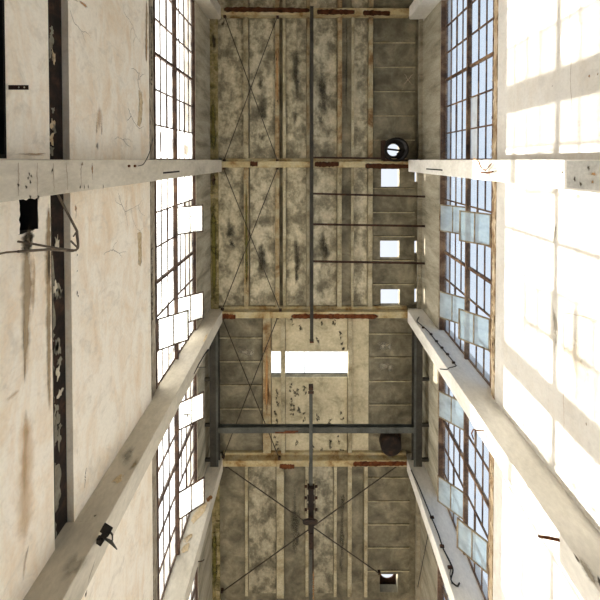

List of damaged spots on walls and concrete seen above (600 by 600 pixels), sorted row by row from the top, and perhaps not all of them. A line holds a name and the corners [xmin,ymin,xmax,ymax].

rust [224,7,355,15]
leakage [22,235,32,374]
spalling [0,194,79,450]